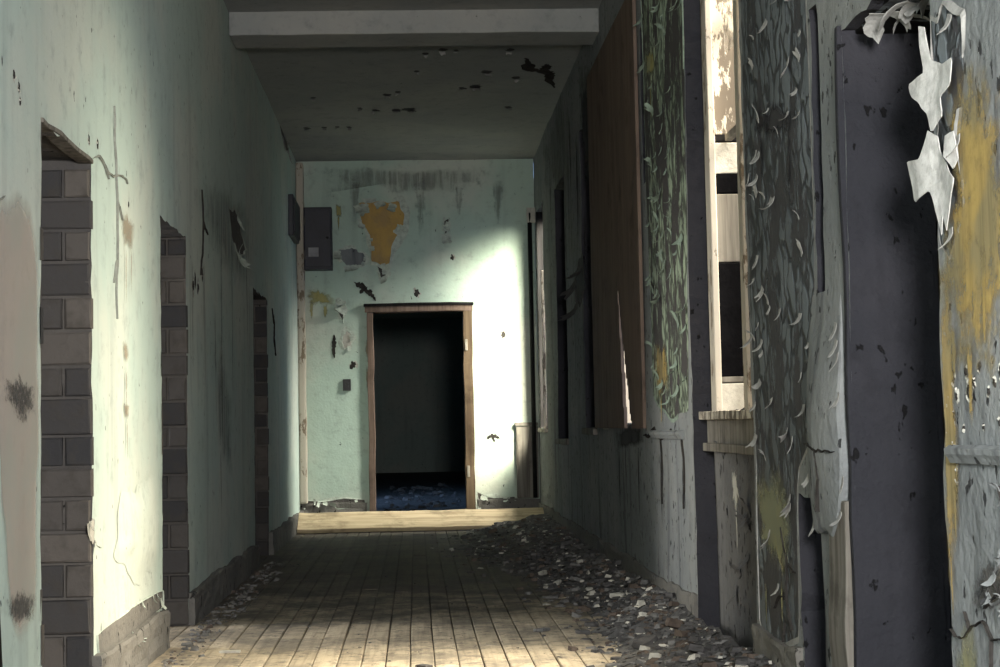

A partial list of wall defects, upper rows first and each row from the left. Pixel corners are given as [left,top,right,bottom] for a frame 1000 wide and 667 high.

crack [94,106,129,319]
peeling [333,196,411,284]
peeling [714,0,815,646]
peeling [862,0,966,260]
water stain [941,72,1000,412]
crack [774,527,796,630]
crack [949,583,1000,667]
flaking render [980,549,1000,617]